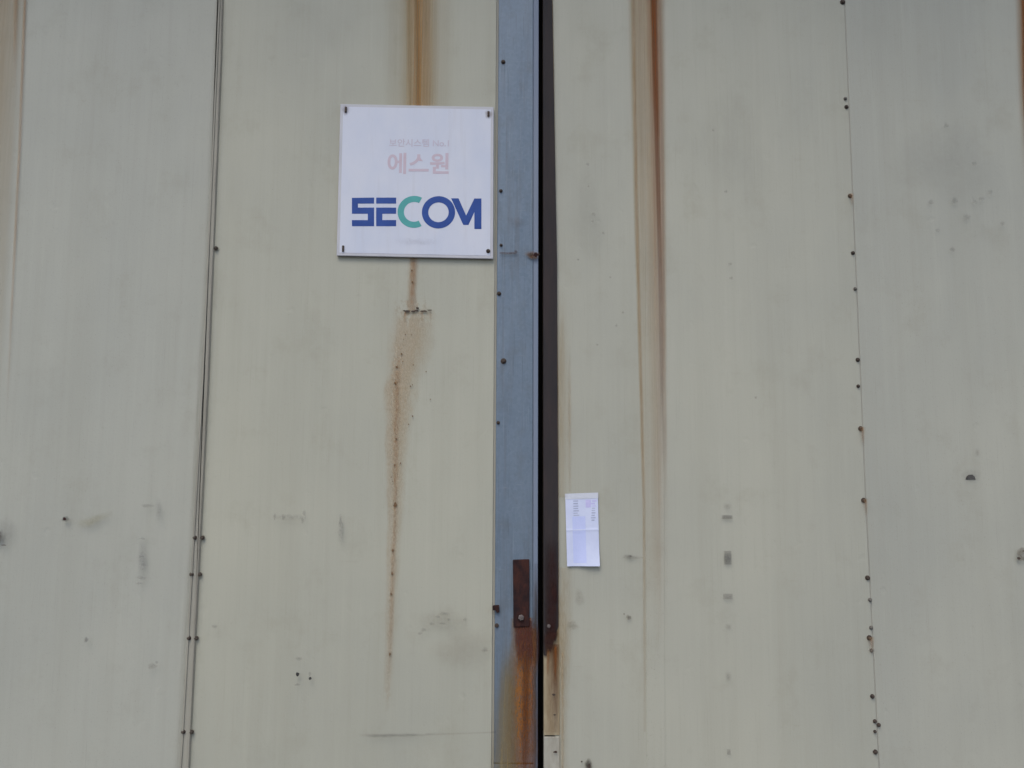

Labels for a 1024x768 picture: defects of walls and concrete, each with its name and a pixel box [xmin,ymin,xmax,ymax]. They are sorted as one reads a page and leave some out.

rust [411,0,425,106]
rust [651,0,661,241]
rust [499,554,557,768]